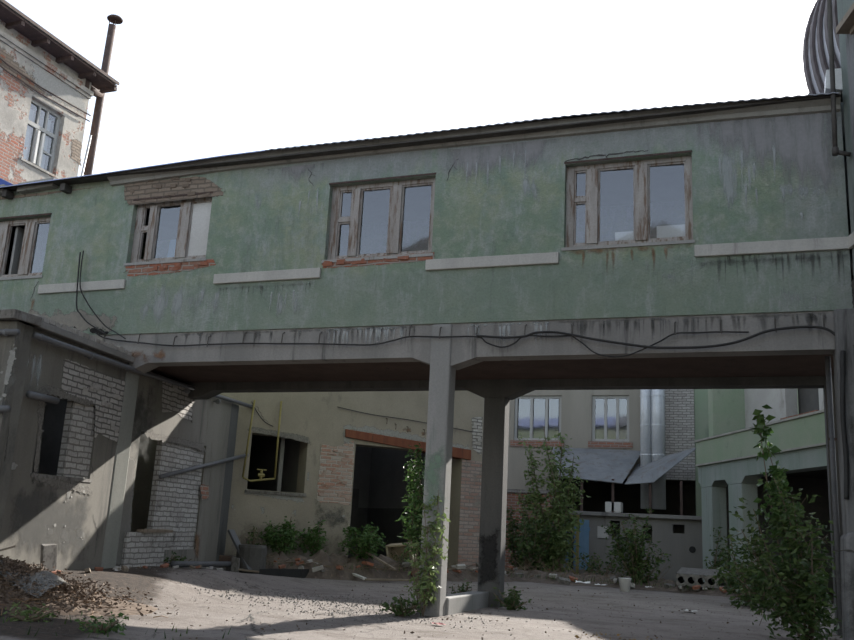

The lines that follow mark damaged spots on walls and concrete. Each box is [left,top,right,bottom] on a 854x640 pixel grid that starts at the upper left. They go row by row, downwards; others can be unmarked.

peeling [0,47,89,113]
flaking render [0,131,28,182]
flaking render [71,139,82,166]
flaking render [124,175,225,205]
flaking render [123,258,217,277]
peeling [0,344,16,403]
damp [11,485,88,555]